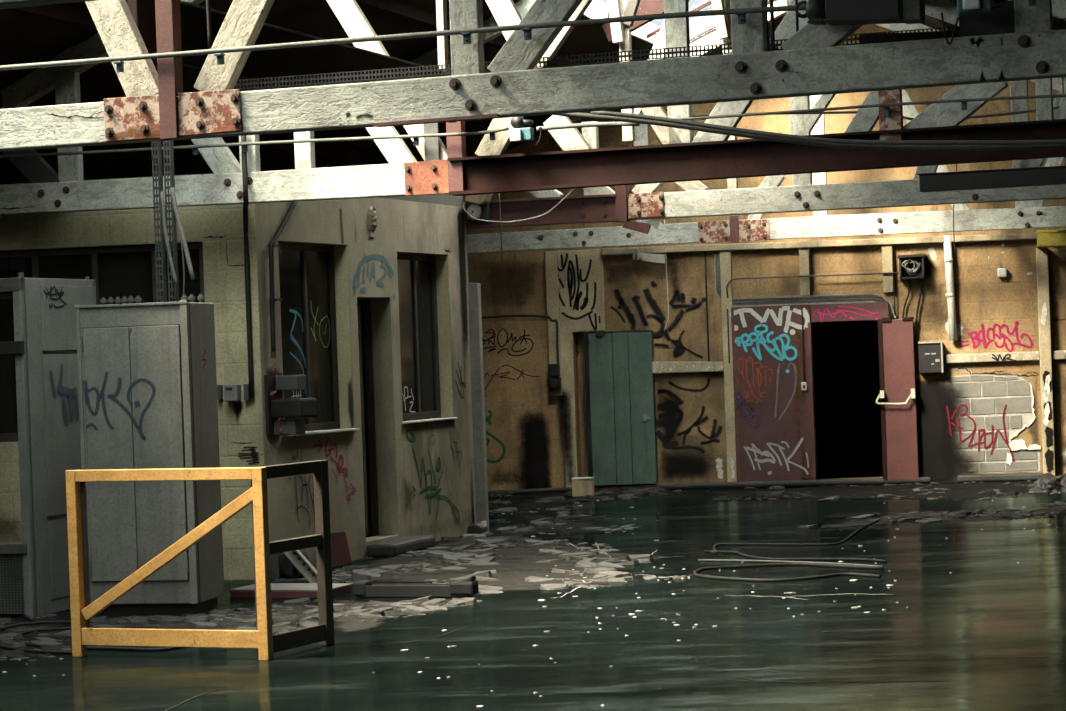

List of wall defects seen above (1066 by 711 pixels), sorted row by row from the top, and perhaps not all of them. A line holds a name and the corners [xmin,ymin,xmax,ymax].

flaking render [942,371,1054,474]